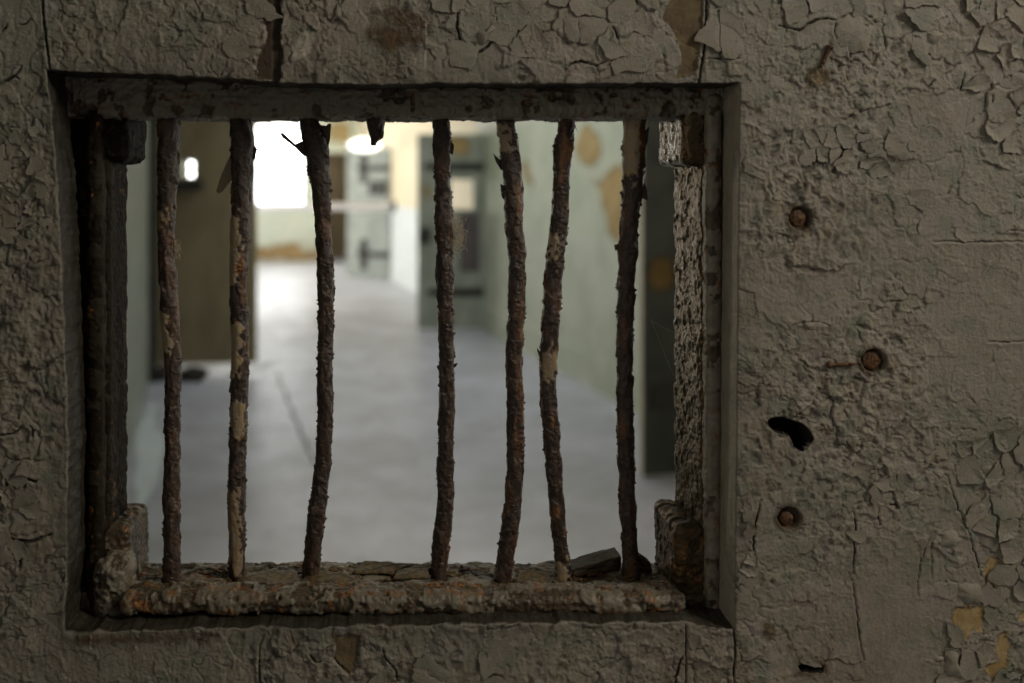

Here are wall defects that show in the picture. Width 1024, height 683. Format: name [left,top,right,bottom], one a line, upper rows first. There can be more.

crack [456,12,493,53]
crack [565,60,606,70]
peeling [904,0,945,65]
peeling [962,0,1024,156]
peeling [0,125,53,250]
rust [321,123,331,166]
peeling [798,123,926,179]
peeling [0,459,51,566]
crack [851,503,899,660]
peeling [936,425,1024,683]